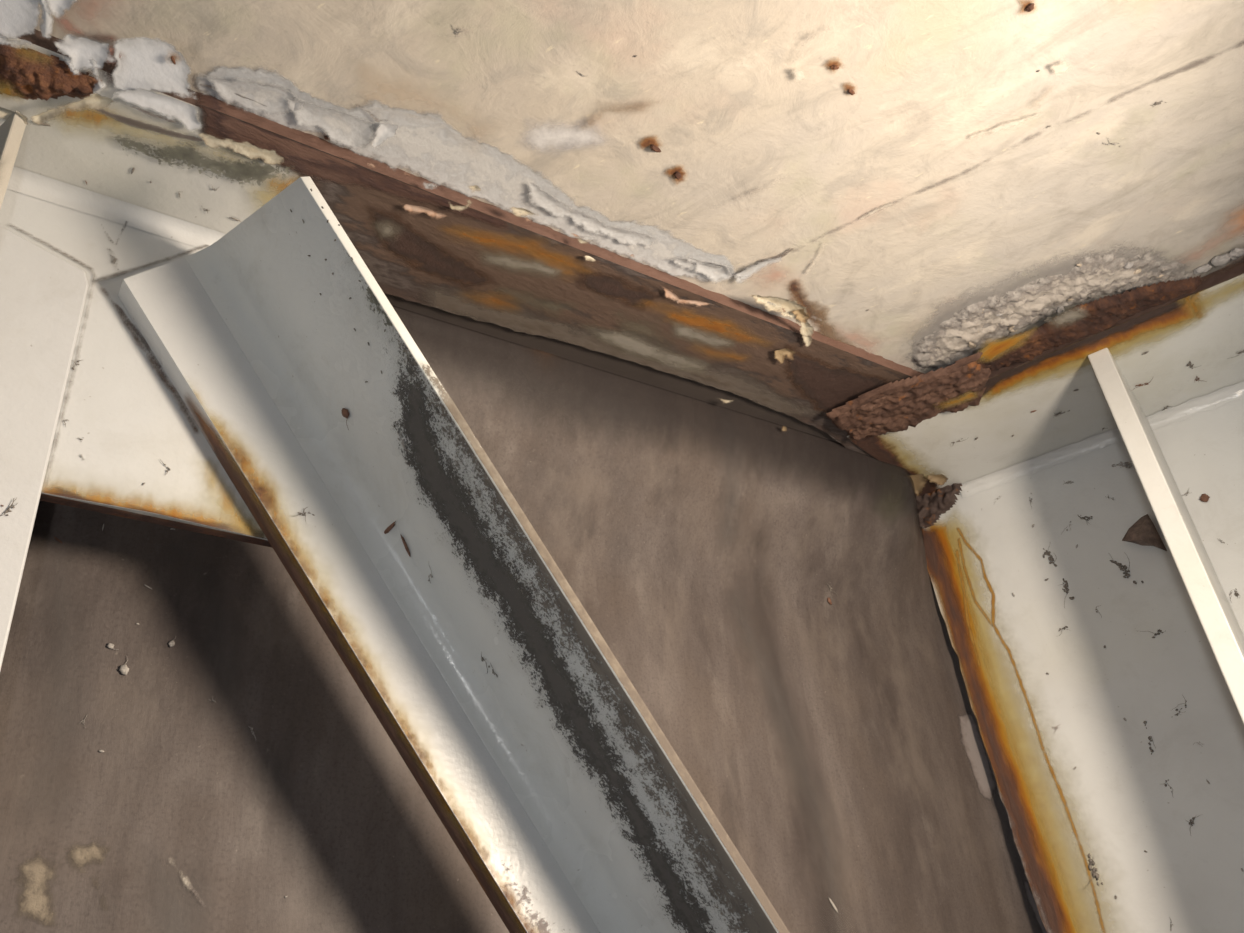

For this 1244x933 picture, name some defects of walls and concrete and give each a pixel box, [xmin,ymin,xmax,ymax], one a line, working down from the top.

peeling [0,0,781,306]
rust [197,92,938,496]
peeling [752,295,814,363]
rust [945,256,1244,405]
rust [40,401,533,933]
leakage [363,286,923,933]
rust [921,519,1106,933]